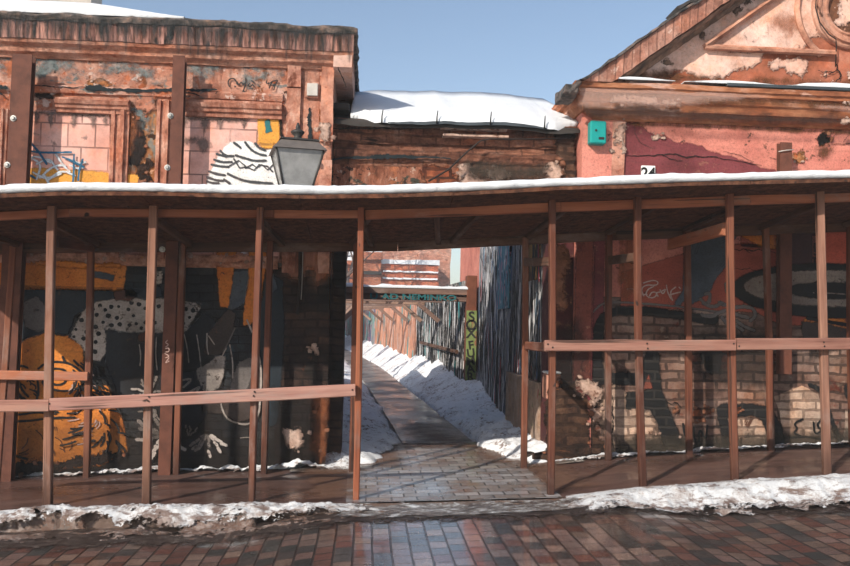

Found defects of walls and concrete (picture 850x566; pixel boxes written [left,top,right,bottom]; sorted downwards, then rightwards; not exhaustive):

peeling [834,0,850,31]
peeling [767,45,809,79]
spalling [84,78,115,87]
spalling [126,96,157,183]
crack [628,134,775,166]
spalling [815,130,834,147]
peeling [282,410,330,456]